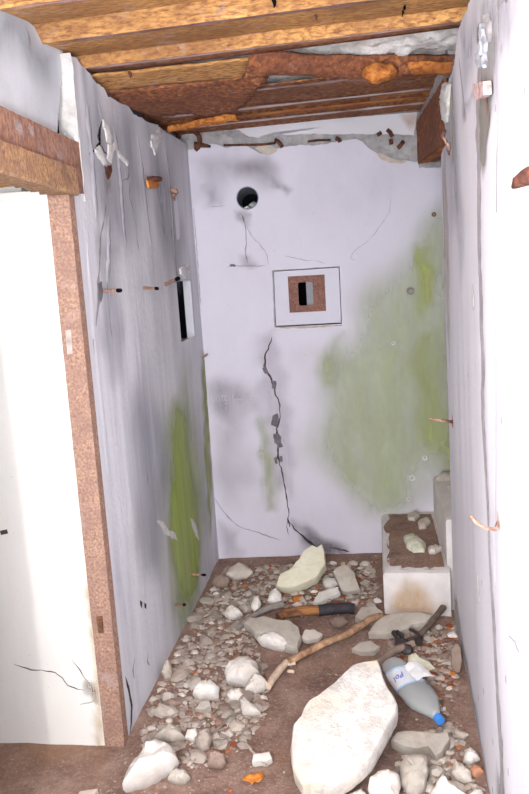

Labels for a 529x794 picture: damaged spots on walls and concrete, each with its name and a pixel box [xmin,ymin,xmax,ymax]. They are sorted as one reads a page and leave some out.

spalling [182,55,249,64]
spalling [283,28,459,56]
rust [407,60,454,76]
spalling [474,13,492,68]
spalling [58,53,129,247]
rust [166,114,240,132]
peeling [106,75,321,254]
spalling [175,112,420,164]
crack [214,338,349,553]
crack [15,660,93,705]